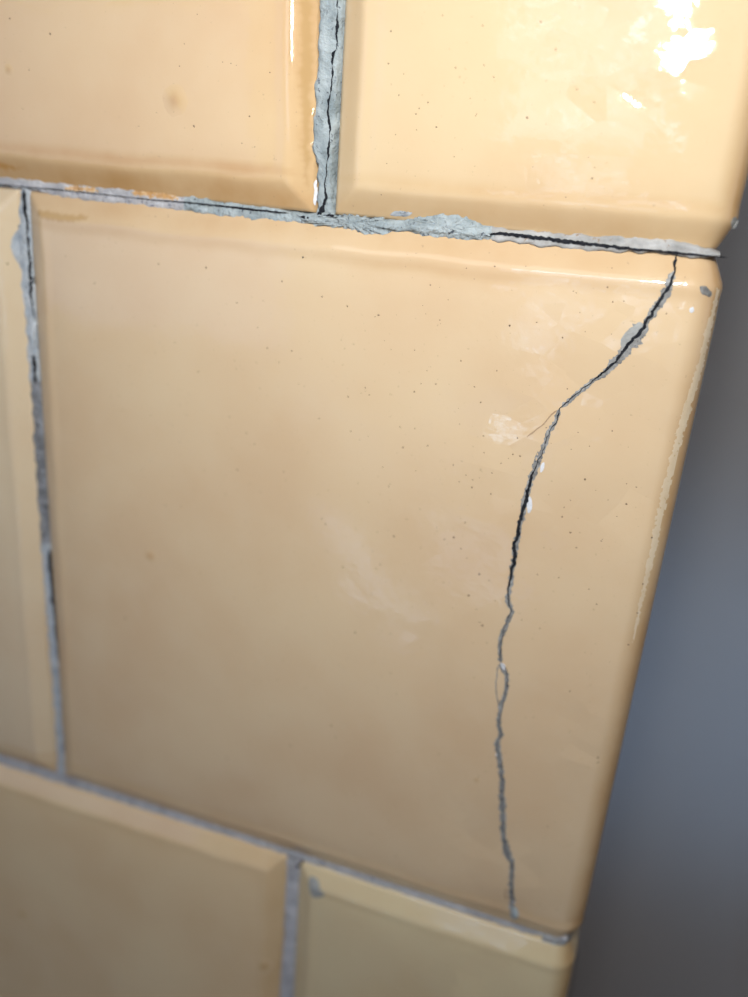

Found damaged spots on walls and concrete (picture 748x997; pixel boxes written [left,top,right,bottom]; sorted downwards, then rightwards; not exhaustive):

crack [490,232,728,921]